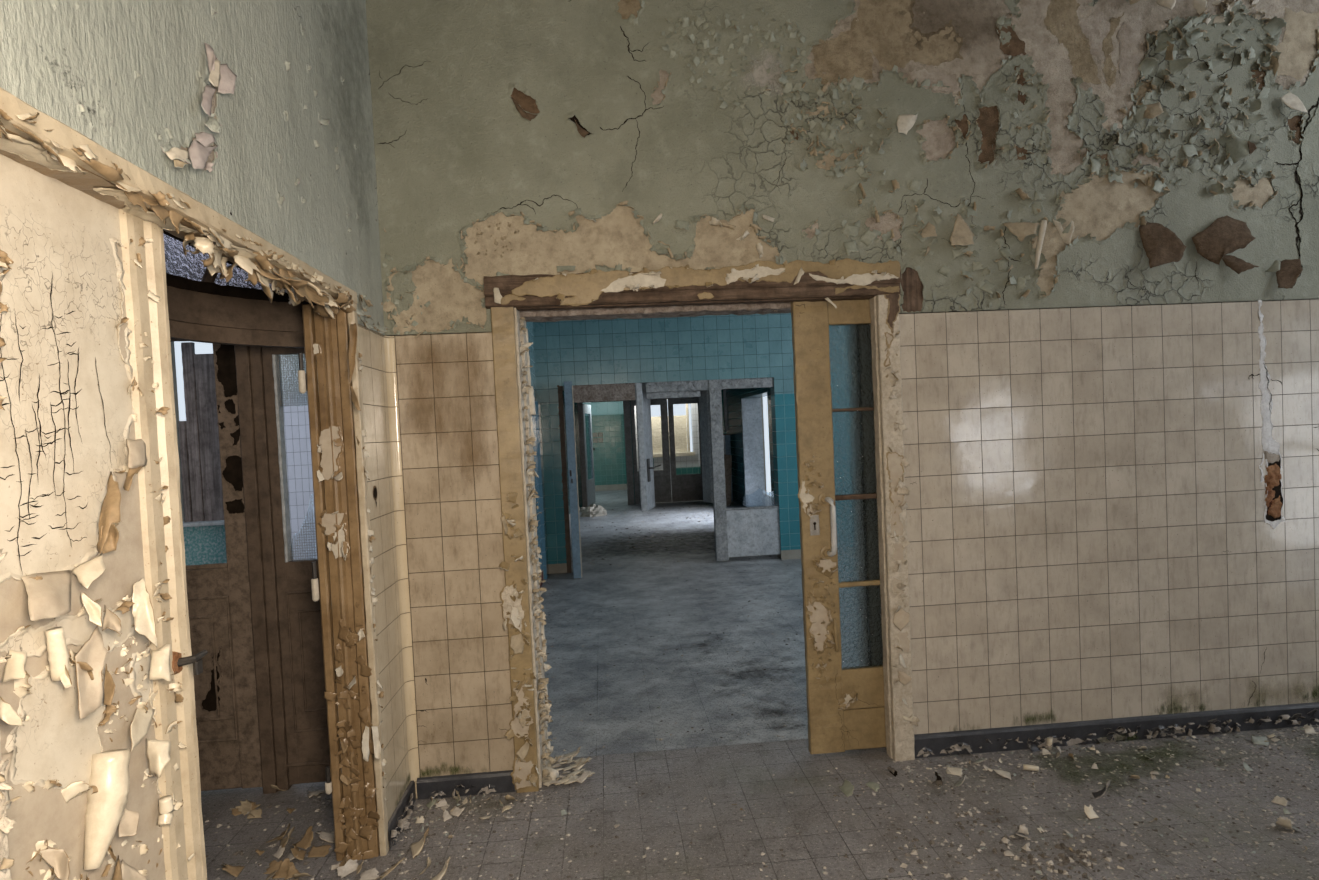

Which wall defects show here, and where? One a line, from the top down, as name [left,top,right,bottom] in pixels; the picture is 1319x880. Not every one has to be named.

peeling [182,228,354,318]
crack [369,61,431,148]
crack [494,195,578,214]
peeling [381,200,788,338]
crack [600,26,662,192]
peeling [801,0,1319,299]
crack [1276,98,1319,285]
peeling [0,237,196,880]
peeling [317,425,344,481]
peeling [318,510,351,561]
peeling [498,327,595,787]
spalling [1259,448,1285,529]